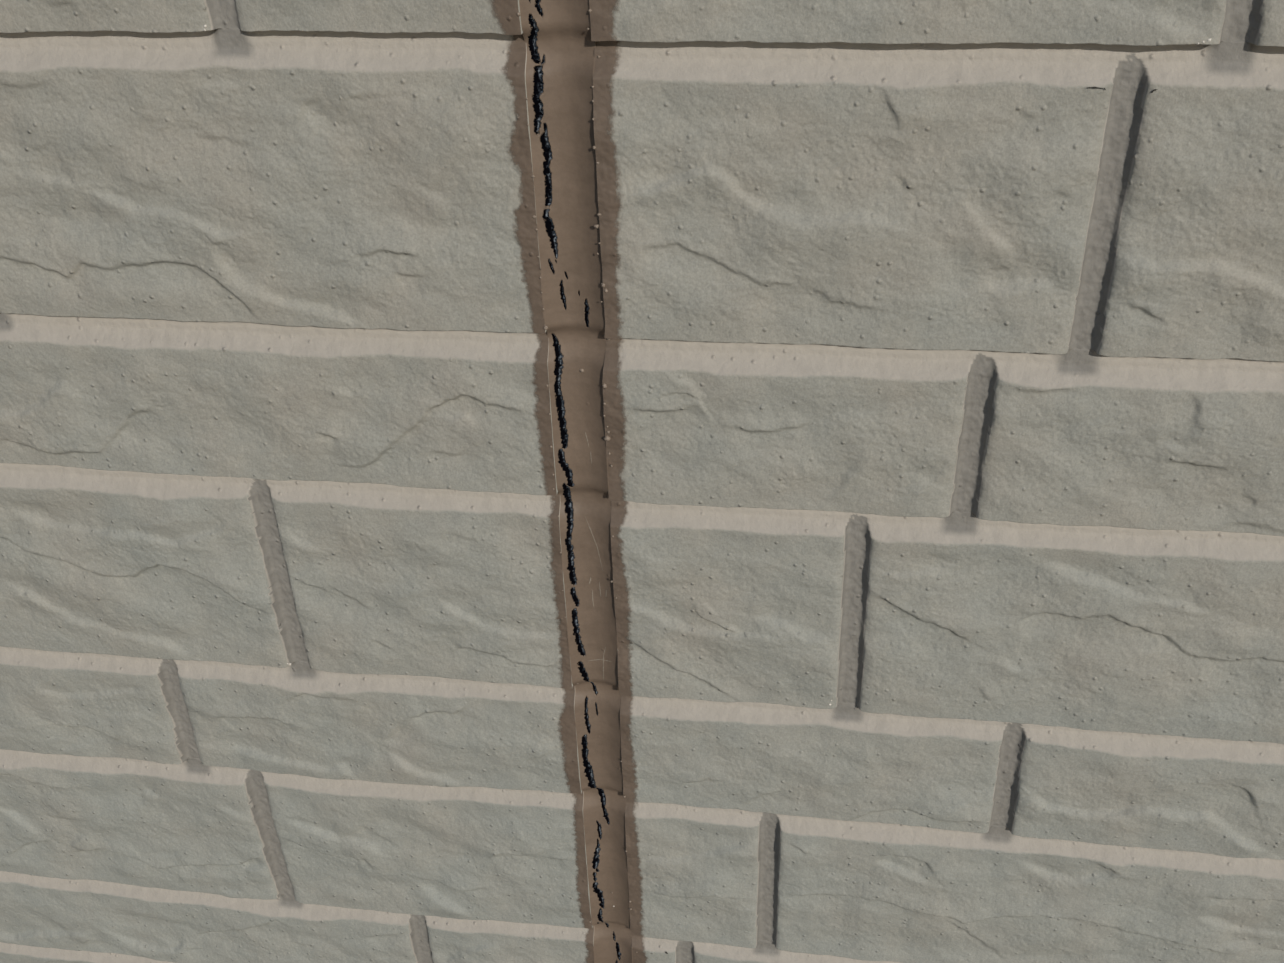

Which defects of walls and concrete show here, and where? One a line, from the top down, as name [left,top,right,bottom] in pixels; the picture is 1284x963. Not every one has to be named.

crack [528,0,621,963]